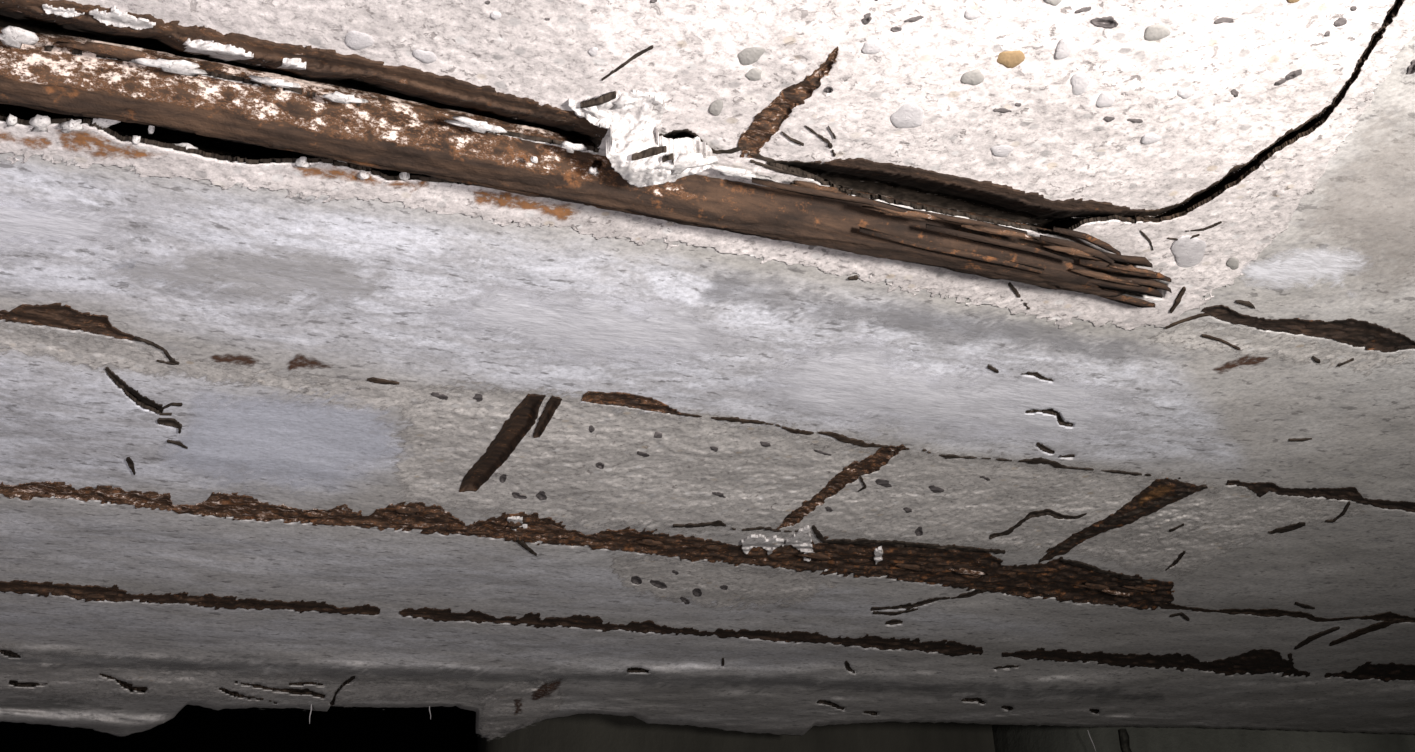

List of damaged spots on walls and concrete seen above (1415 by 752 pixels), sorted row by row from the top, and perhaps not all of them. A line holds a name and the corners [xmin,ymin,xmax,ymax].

crack [710,0,1404,251]
rust [0,131,147,158]
rust [297,167,426,186]
spalling [0,0,1415,376]
rust [475,192,573,220]
crack [672,364,1181,479]
crack [1289,436,1312,444]
crack [989,509,1087,540]
crack [1161,523,1415,650]